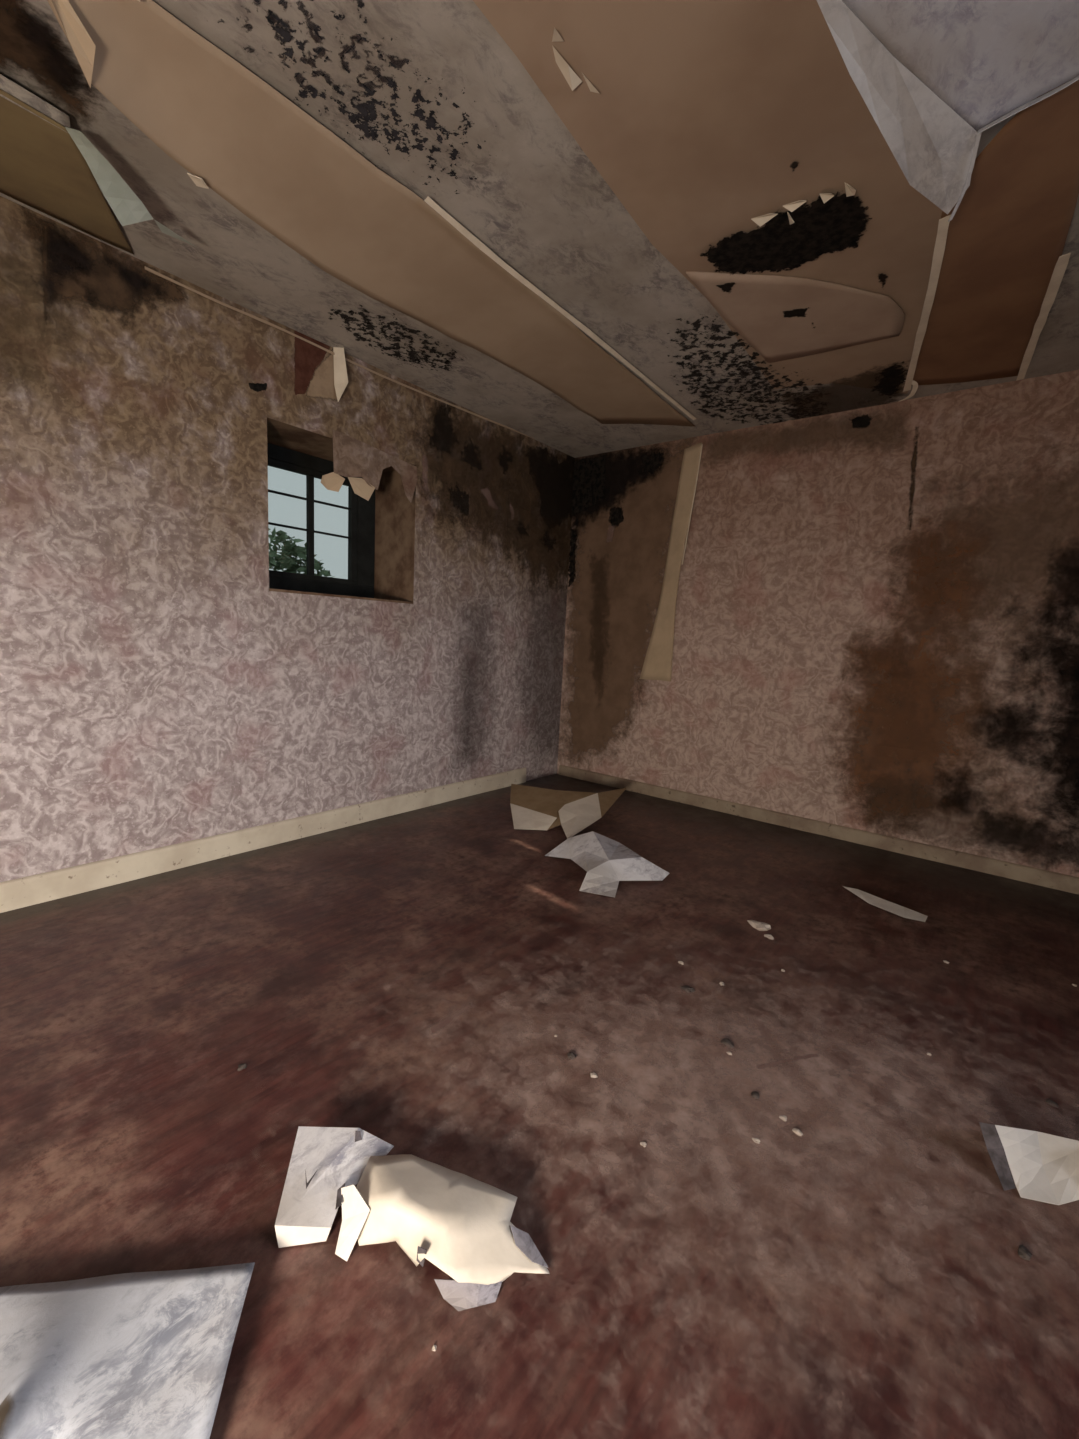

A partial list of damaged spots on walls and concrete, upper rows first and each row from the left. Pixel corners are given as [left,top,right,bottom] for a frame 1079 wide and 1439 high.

leakage [0,0,188,325]
spalling [249,383,267,392]
peeling [294,331,348,402]
leakage [218,0,491,194]
leakage [328,305,462,371]
peeling [473,0,942,394]
leakage [662,315,908,459]
leakage [700,182,872,293]
leakage [783,307,815,328]
leakage [411,401,664,589]
peeling [560,437,696,762]
leakage [944,472,1079,864]